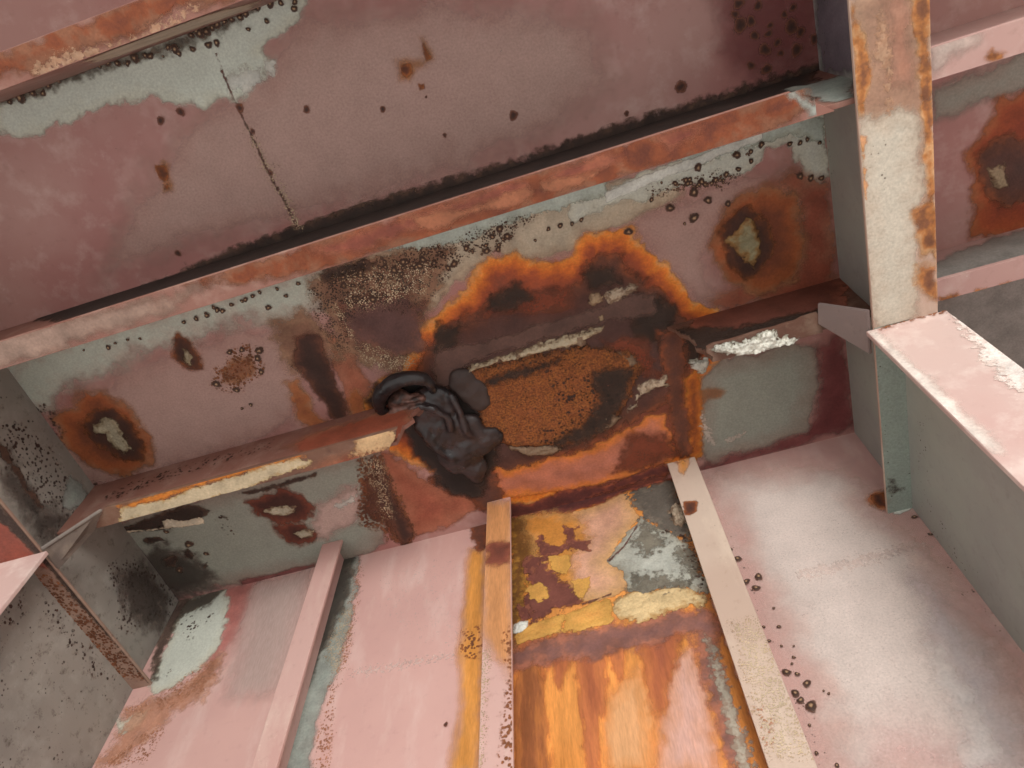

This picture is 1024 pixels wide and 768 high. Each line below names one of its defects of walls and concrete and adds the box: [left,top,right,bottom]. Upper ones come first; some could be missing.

peeling [0,0,307,138]
crack [215,53,304,230]
corrosion [851,0,935,213]
corrosion [33,63,850,768]
peeling [513,480,709,644]